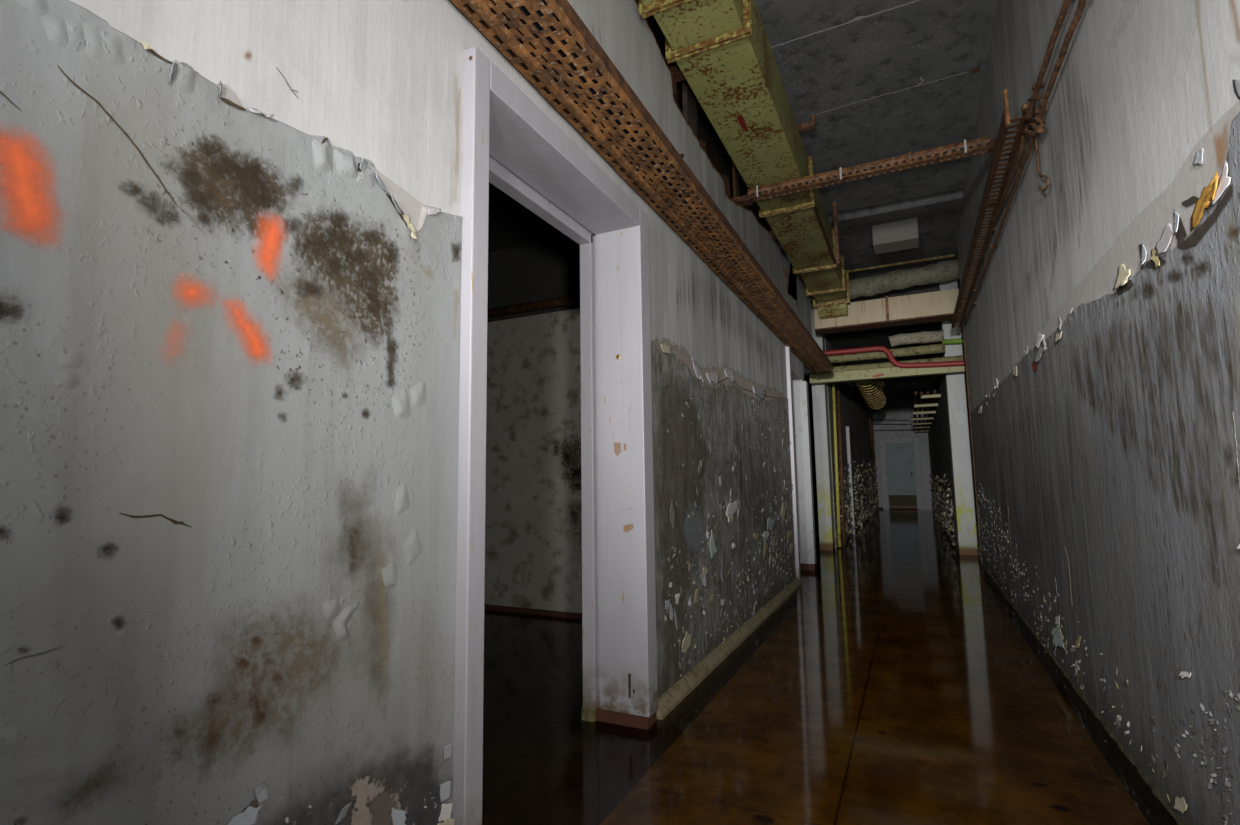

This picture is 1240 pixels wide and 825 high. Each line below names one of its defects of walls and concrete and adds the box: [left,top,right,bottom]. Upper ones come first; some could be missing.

water stain [126,136,425,417]
peeling [977,80,1240,414]
water stain [554,436,582,545]
peeling [654,338,794,679]
peeling [978,483,1240,825]
peeling [227,781,268,825]
spalling [329,775,455,825]